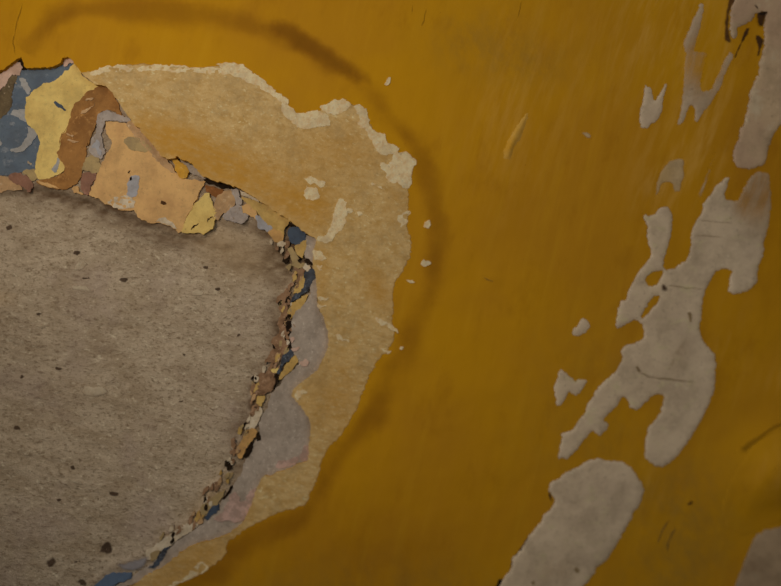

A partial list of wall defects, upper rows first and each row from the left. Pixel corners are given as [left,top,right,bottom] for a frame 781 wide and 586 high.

flaking render [0,59,417,586]
peeling [496,458,644,586]
peeling [554,0,781,467]
peeling [735,527,781,586]